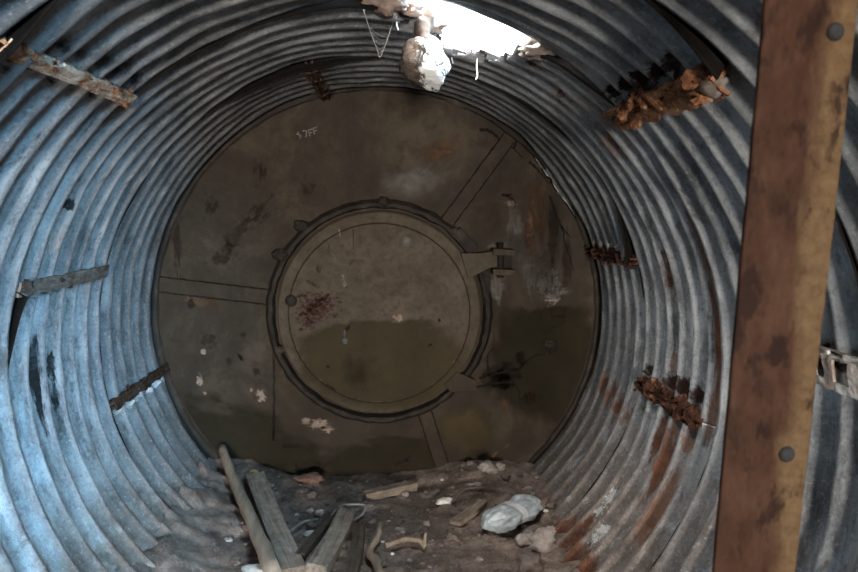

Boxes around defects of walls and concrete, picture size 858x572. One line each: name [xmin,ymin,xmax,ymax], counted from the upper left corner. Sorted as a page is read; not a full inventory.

corrosion [611,85,649,130]
corrosion [673,63,713,105]
corrosion [295,283,342,331]
corrosion [633,212,722,543]